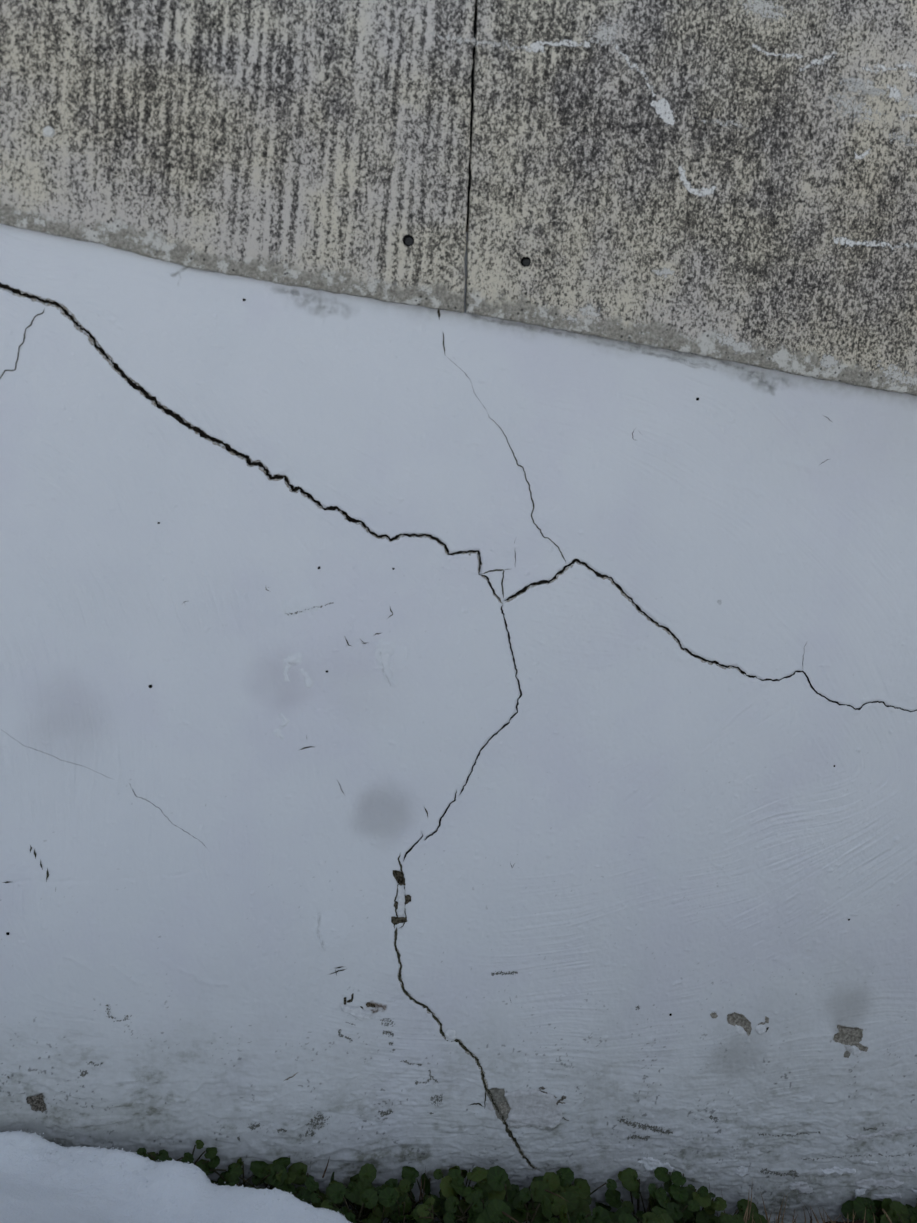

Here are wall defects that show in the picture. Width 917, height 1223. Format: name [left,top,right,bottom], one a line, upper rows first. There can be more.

crack [0,283,917,1170]
peeling [340,993,386,1020]
spalling [710,1012,752,1037]
spalling [833,1025,868,1058]